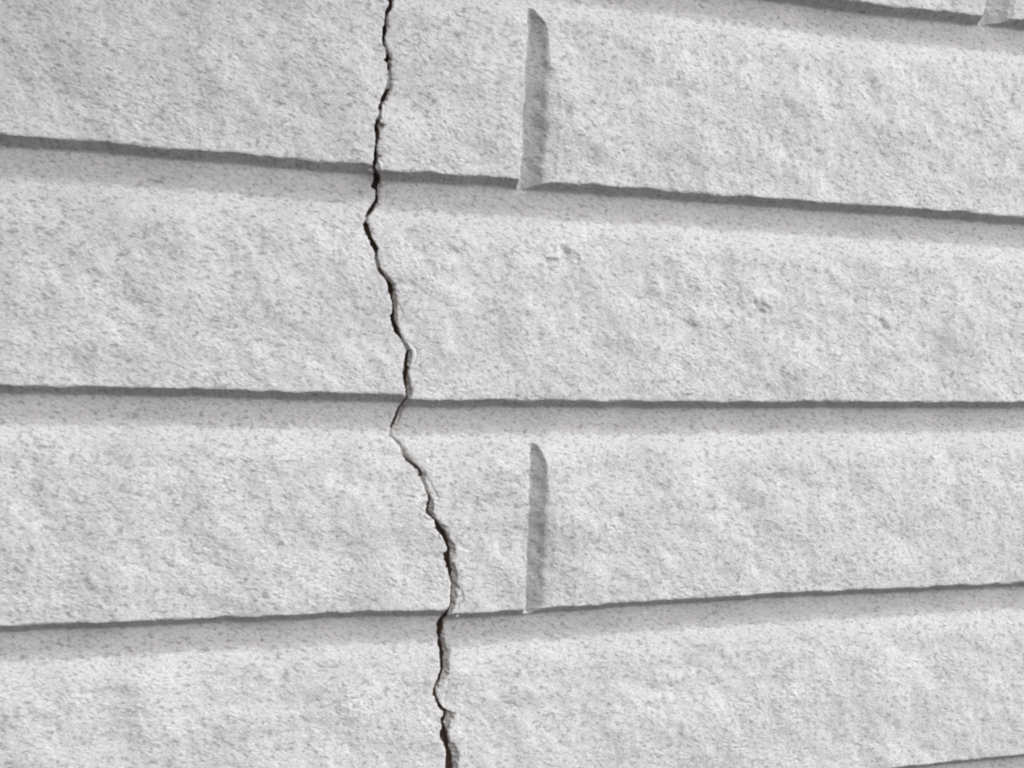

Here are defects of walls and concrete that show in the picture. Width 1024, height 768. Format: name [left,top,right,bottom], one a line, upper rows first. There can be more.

crack [363,0,472,768]